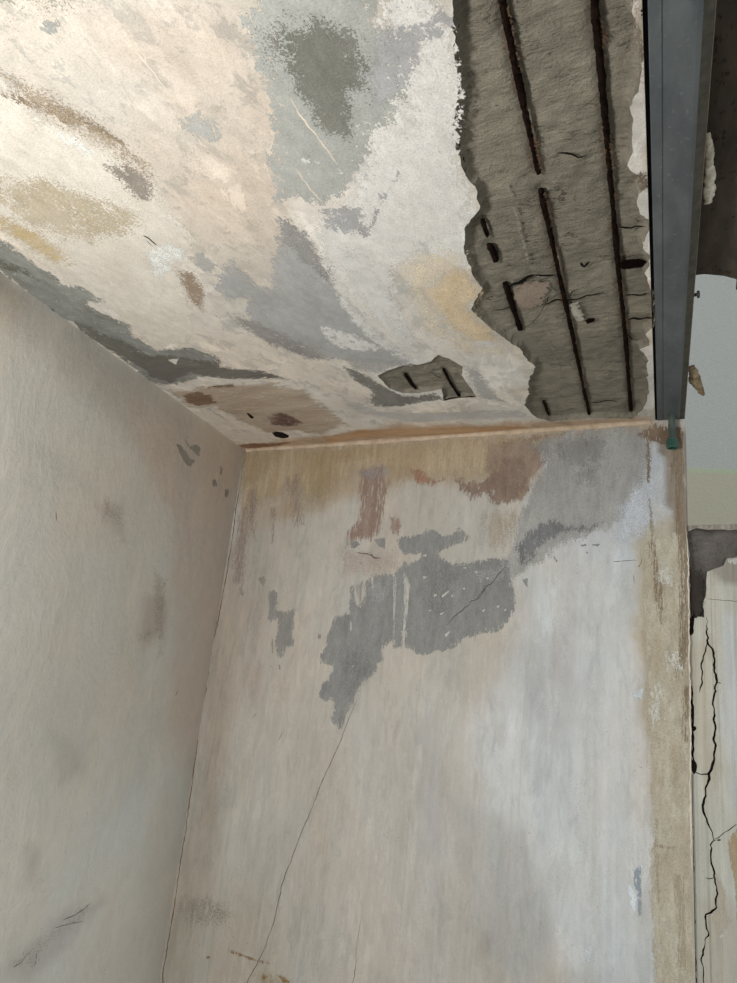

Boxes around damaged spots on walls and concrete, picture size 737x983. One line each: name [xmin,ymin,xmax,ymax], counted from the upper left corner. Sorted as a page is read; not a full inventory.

water stain [365,0,454,115]
water stain [0,67,158,267]
water stain [142,242,206,313]
peeling [189,0,476,401]
water stain [318,170,400,238]
spalling [451,0,655,422]
water stain [335,352,531,423]
crack [247,701,357,983]
peeling [318,527,528,729]
flaking render [686,528,737,869]
crack [689,599,737,983]
rust [231,950,292,983]